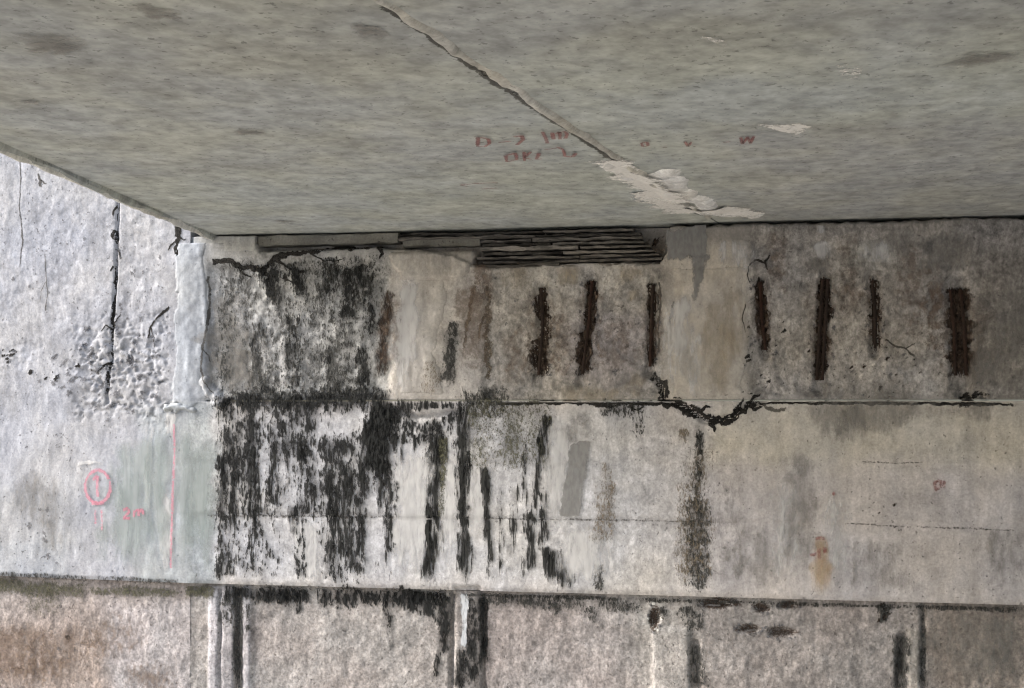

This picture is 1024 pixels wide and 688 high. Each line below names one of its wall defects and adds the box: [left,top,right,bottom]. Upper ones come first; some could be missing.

crack [380,7,638,175]
crack [97,203,121,392]
crack [498,282,1013,432]
damp [0,255,1022,688]